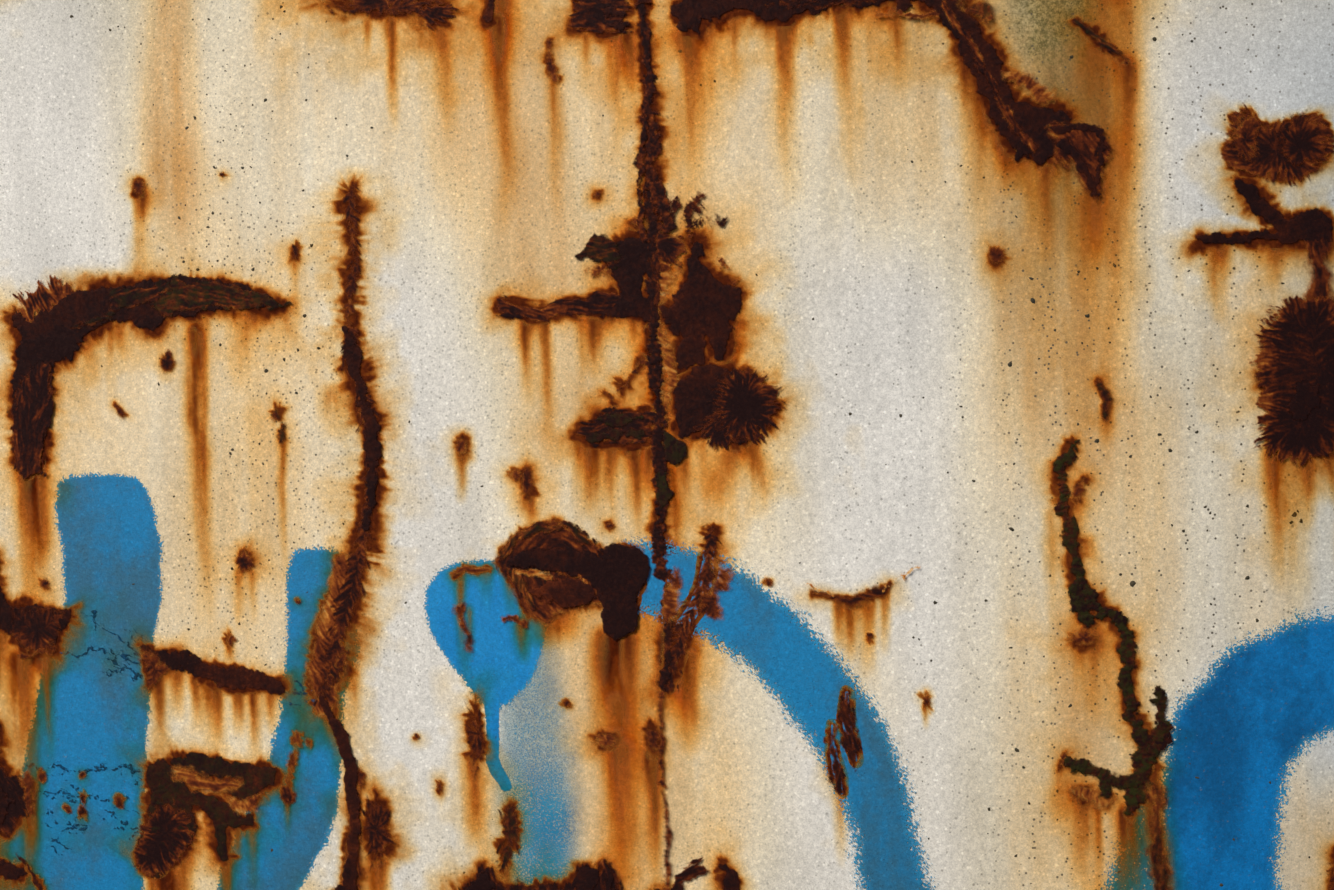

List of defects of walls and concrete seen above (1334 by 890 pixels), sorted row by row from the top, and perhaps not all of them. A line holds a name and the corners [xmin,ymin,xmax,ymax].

corrosion [309,0,462,70]
corrosion [565,0,653,63]
corrosion [669,0,1111,201]
corrosion [2,274,292,550]
corrosion [491,192,785,495]
corrosion [1187,105,1334,507]
corrosion [0,558,81,711]
corrosion [136,554,350,724]
corrosion [450,464,661,815]
corrosion [114,731,312,890]
corrosion [450,799,624,890]
corrosion [650,855,742,890]